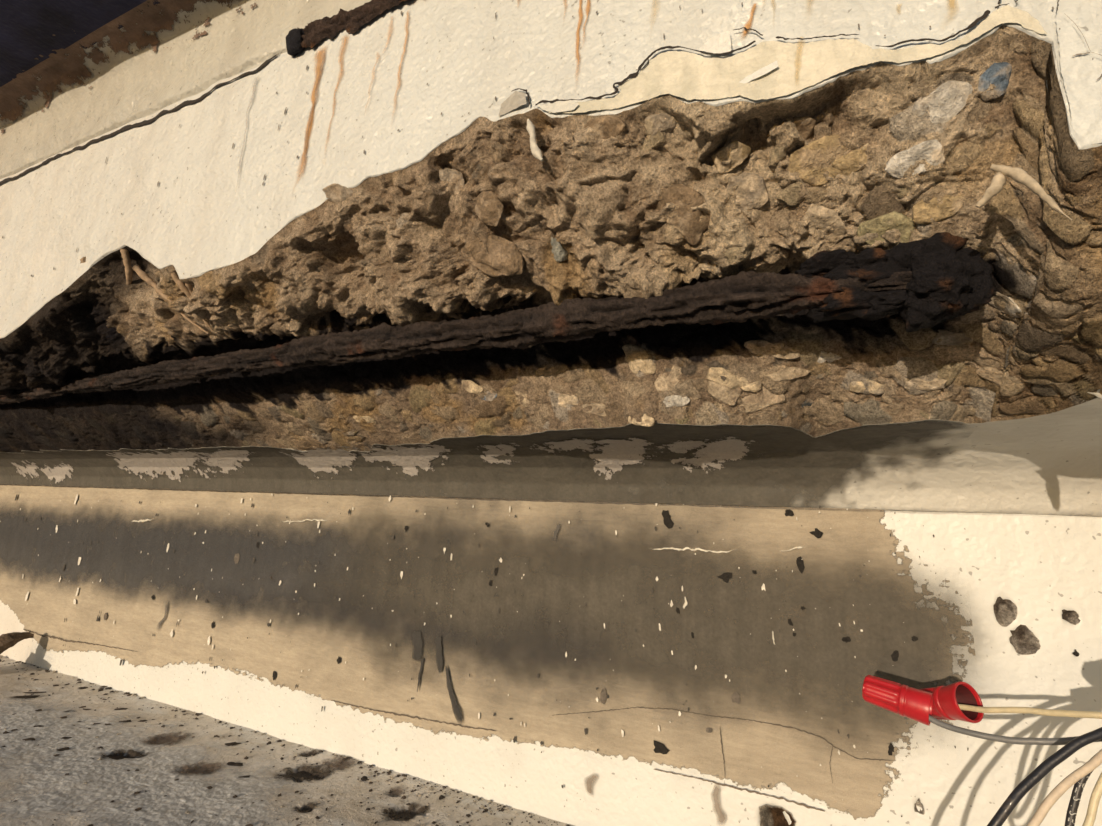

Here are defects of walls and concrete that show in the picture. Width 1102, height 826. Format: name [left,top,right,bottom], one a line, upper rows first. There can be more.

rust [286,0,408,169]
rust [576,0,590,64]
crack [511,0,1018,106]
crack [1056,0,1102,80]
spalling [0,5,1102,453]
rust [795,232,994,332]
leakage [0,509,961,729]
leakage [0,703,283,826]